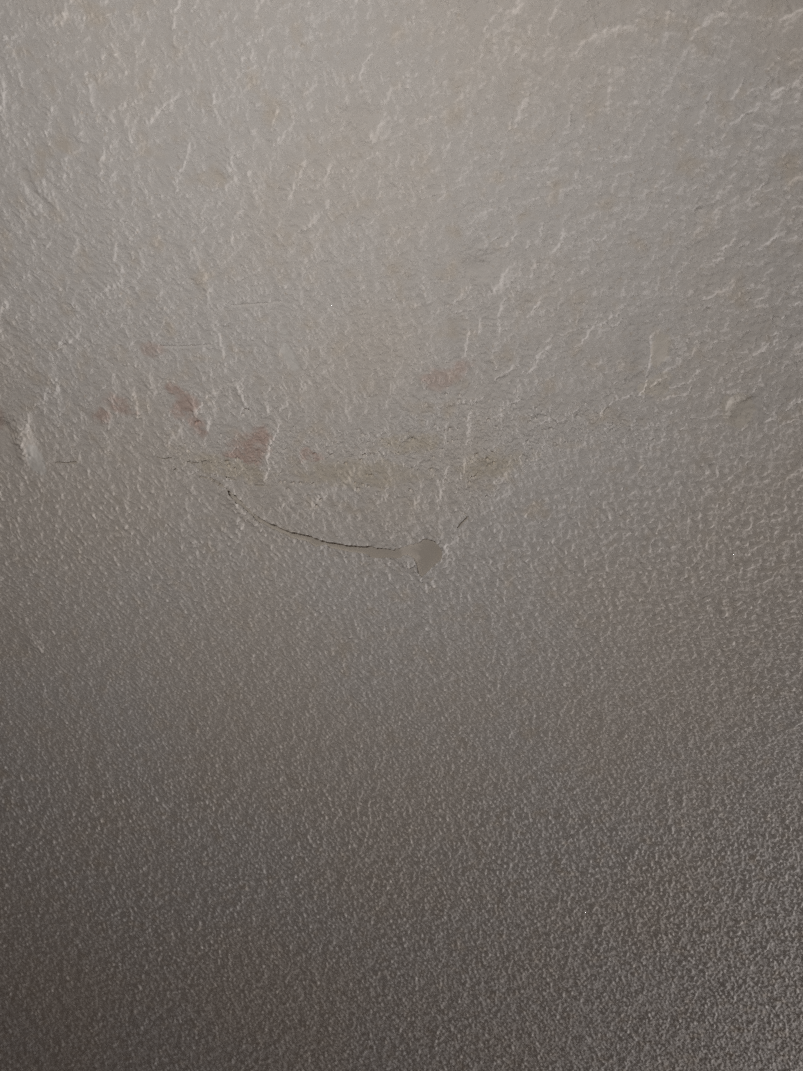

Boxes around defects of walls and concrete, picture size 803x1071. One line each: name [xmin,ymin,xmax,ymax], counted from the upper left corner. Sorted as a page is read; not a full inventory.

crack [157,455,469,585]